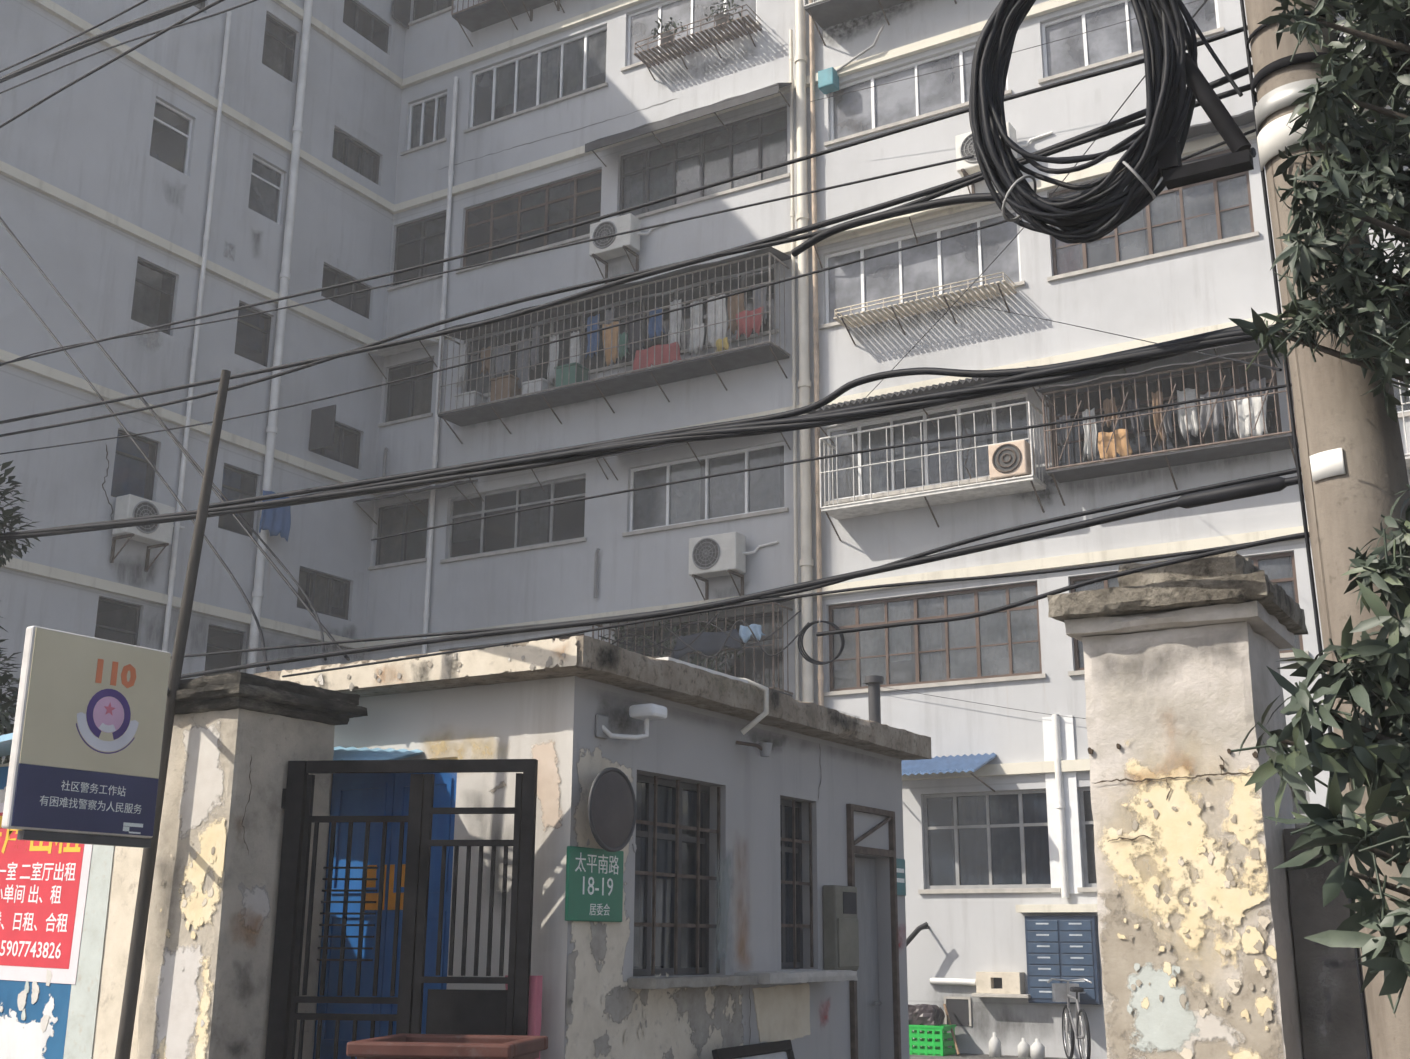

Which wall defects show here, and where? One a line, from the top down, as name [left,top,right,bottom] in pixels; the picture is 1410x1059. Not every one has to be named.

leakage [828,709,858,729]
flaking render [531,741,634,849]
crack [1094,755,1254,801]
peeling [162,818,226,939]
flaking render [565,836,746,1059]
peeling [1098,743,1284,1059]
peeling [0,969,52,1032]
peeling [151,1038,166,1059]
peeling [194,956,213,1059]